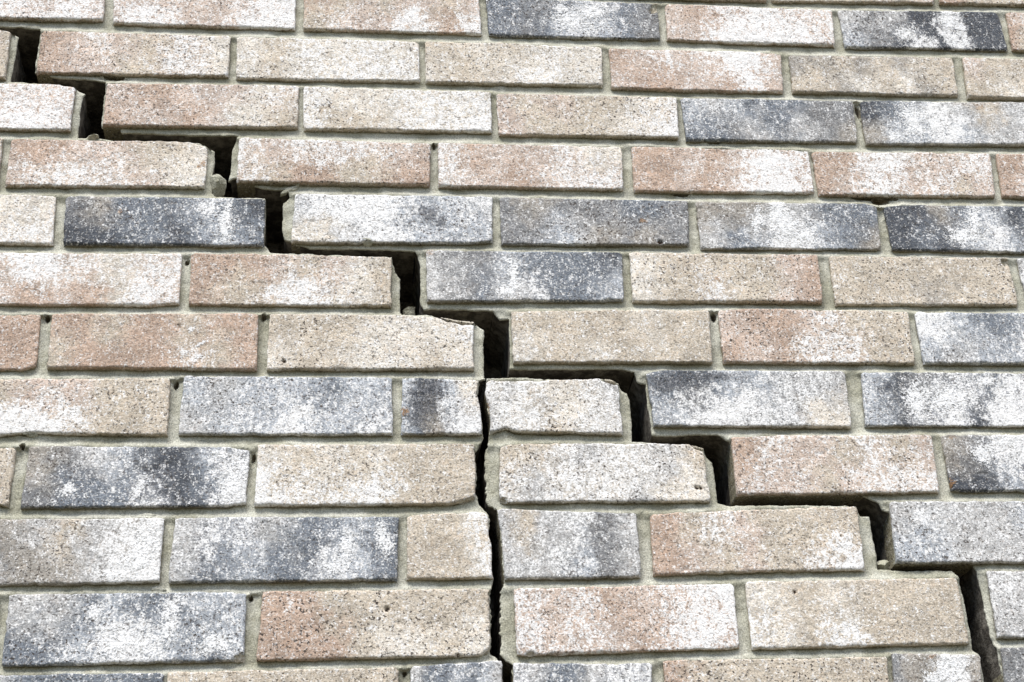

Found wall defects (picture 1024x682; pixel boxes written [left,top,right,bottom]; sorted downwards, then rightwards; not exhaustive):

crack [0,28,735,682]
crack [847,498,889,562]
crack [955,567,1001,682]